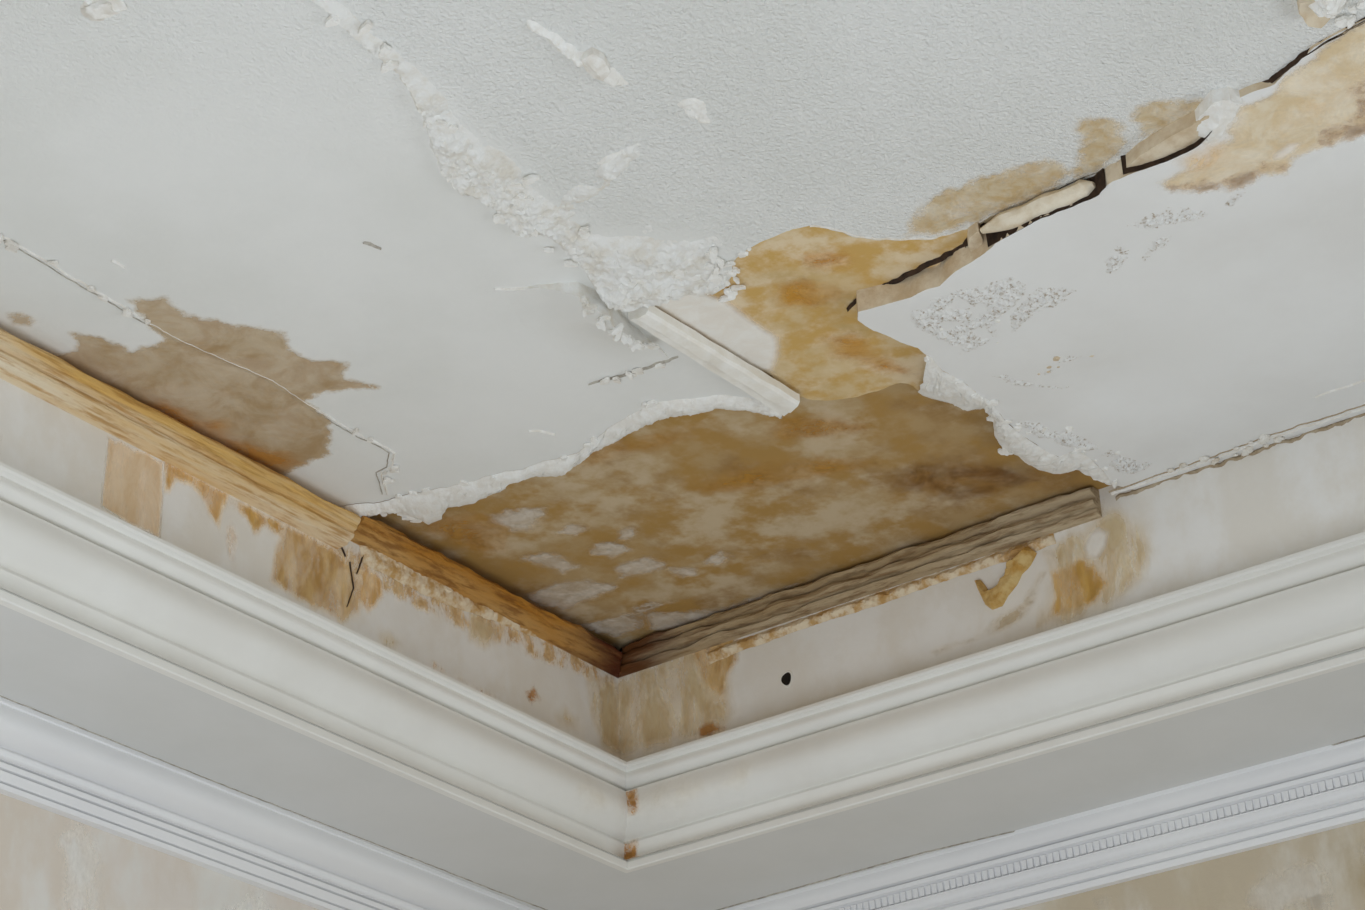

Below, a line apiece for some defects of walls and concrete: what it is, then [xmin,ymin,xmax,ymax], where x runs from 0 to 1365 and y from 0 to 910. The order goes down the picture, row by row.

leakage [1167,22,1365,194]
crack [1262,17,1365,83]
peeling [312,0,1153,491]
crack [846,131,1212,312]
crack [0,234,399,495]
leakage [57,299,376,475]
spalling [341,395,856,540]
crack [341,547,364,607]
leakage [244,508,733,750]
spalling [531,554,616,607]
spalling [584,603,745,635]
leakage [1054,516,1144,618]